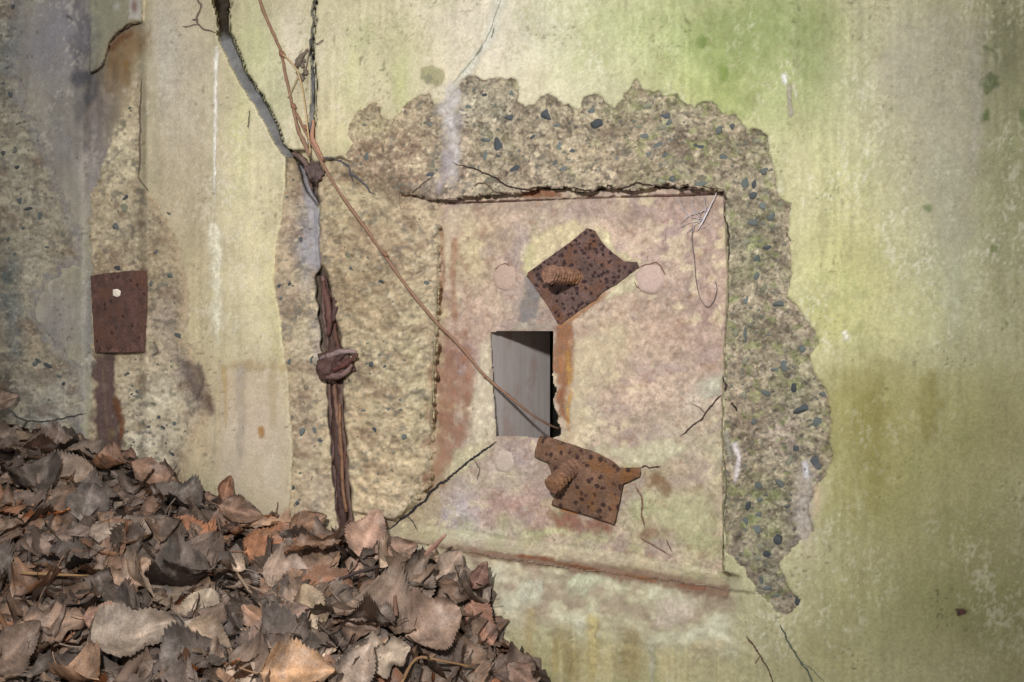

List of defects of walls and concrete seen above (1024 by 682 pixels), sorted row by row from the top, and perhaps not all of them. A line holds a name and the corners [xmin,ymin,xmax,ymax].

crack [183,0,376,195]
crack [453,162,730,264]
corrosion [92,353,124,448]
spalling [273,66,833,618]
corrosion [553,295,603,423]
crack [389,442,496,531]
leakage [794,461,819,535]
corrosion [465,549,729,598]
crack [746,636,773,682]
crack [780,625,822,682]